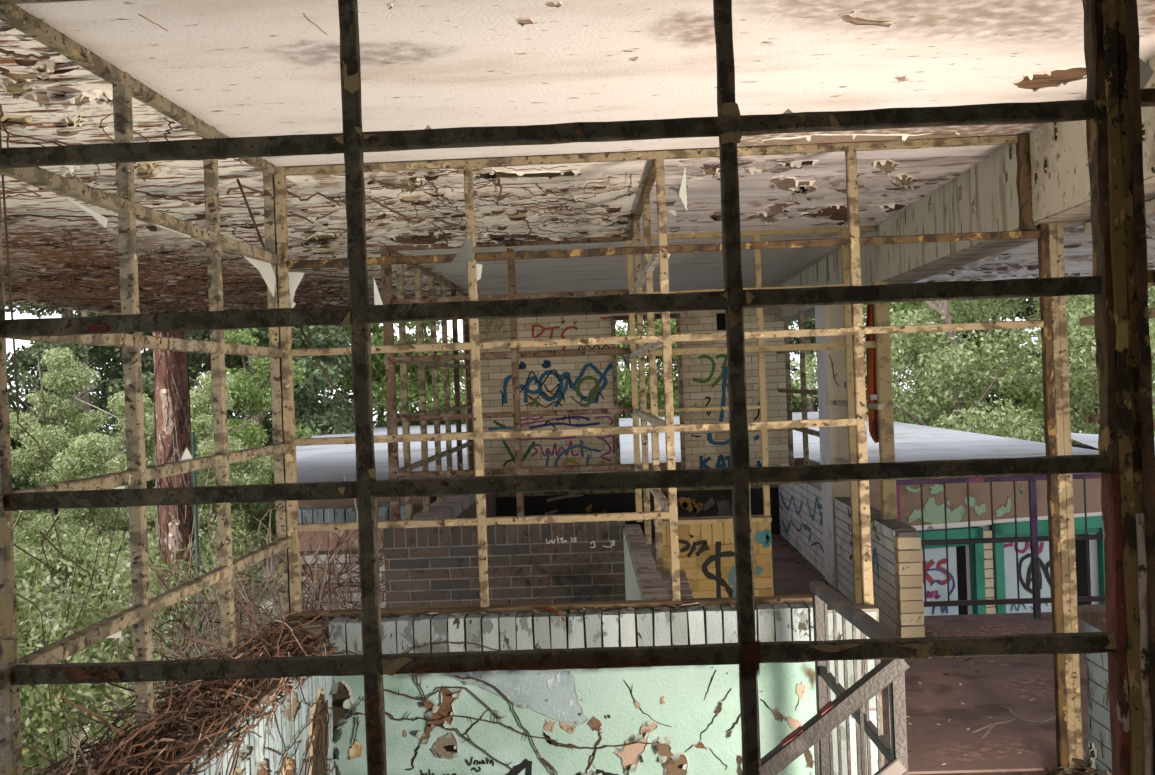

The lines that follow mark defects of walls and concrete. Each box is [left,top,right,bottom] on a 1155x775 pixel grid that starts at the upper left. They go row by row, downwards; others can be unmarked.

peeling [1011,65,1087,92]
peeling [134,161,181,182]
peeling [364,102,742,249]
peeling [738,113,976,231]
peeling [286,174,351,324]
peeling [160,389,174,435]
peeling [168,520,183,554]
crack [462,709,489,741]
peeling [403,669,611,759]
crack [623,670,799,770]
crack [405,745,420,771]
crack [585,732,602,773]